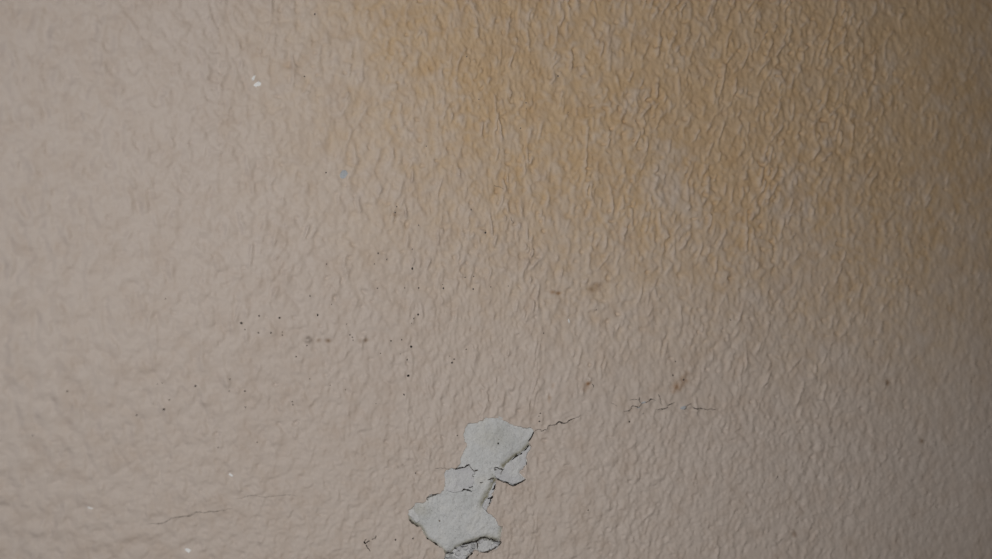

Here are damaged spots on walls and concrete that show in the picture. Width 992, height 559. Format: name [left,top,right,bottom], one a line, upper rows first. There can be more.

crack [612,395,716,412]
peeling [408,416,534,559]